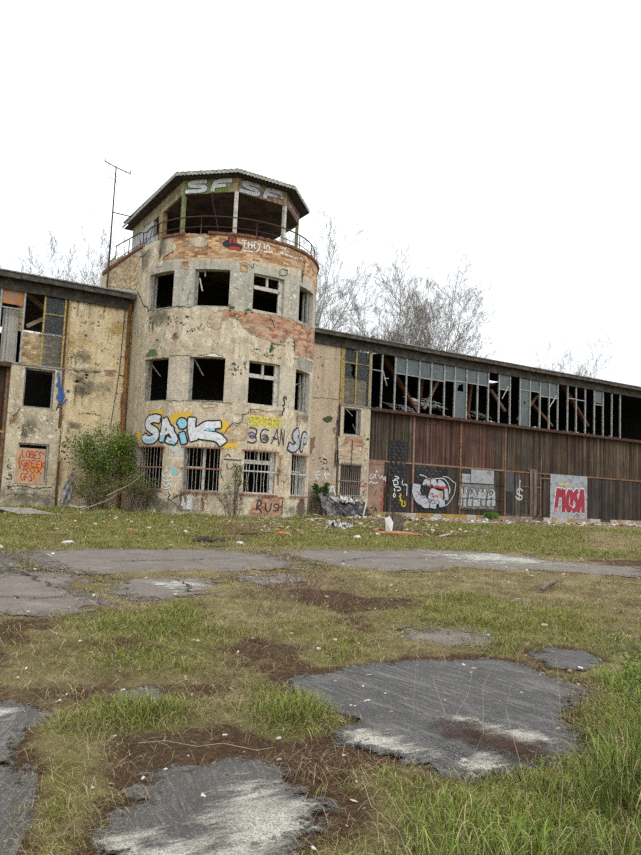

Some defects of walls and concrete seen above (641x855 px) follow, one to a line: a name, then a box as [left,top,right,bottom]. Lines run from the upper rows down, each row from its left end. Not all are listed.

flaking render [145,233,326,447]
flaking render [310,416,369,504]